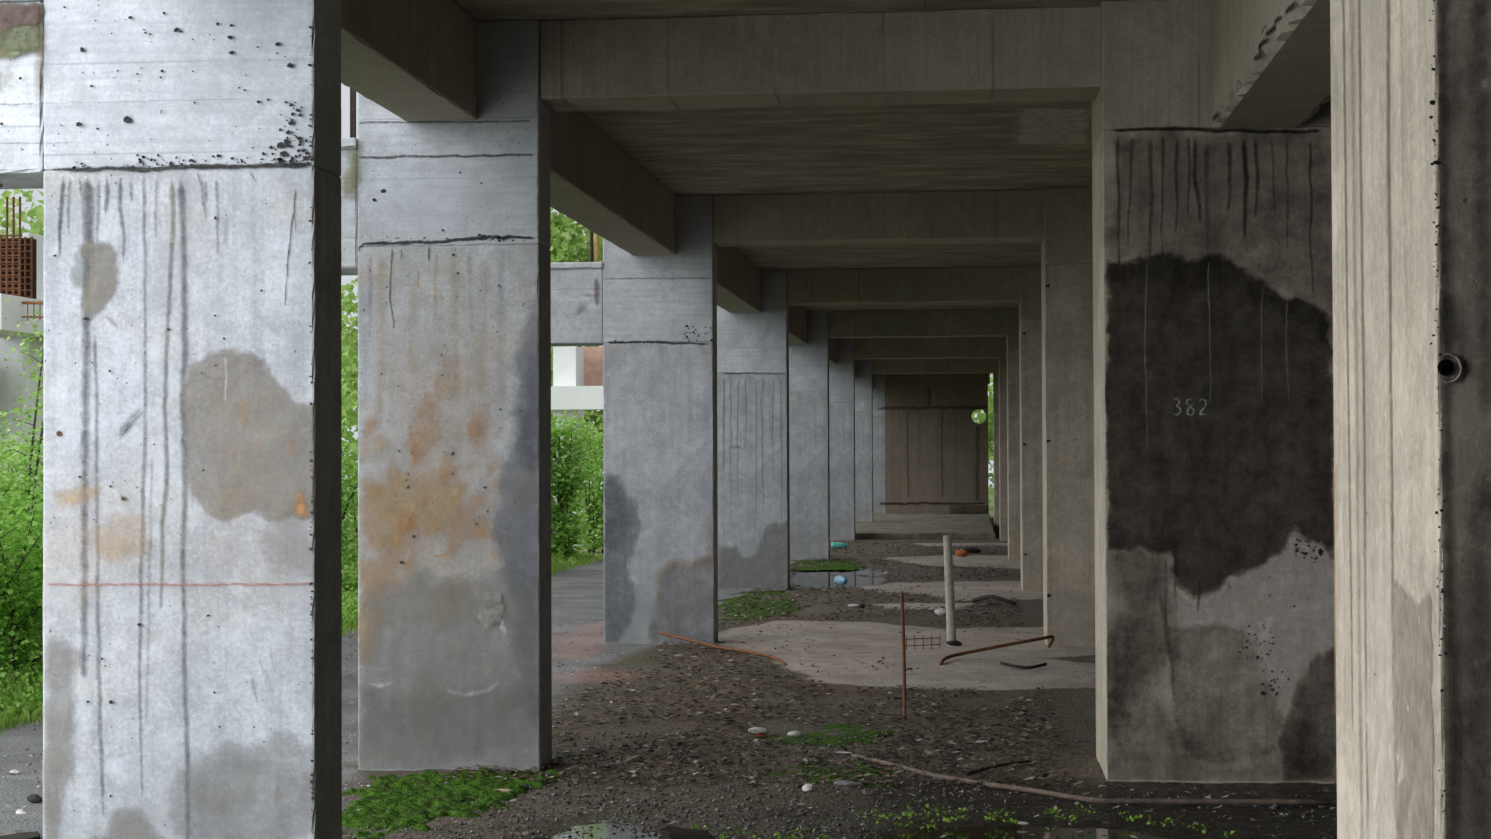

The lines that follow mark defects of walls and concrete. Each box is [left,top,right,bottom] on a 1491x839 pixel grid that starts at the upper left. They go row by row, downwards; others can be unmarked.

spalling [0,2,43,61]
leakage [75,183,121,399]
leakage [163,277,313,526]
leakage [1105,0,1368,839]